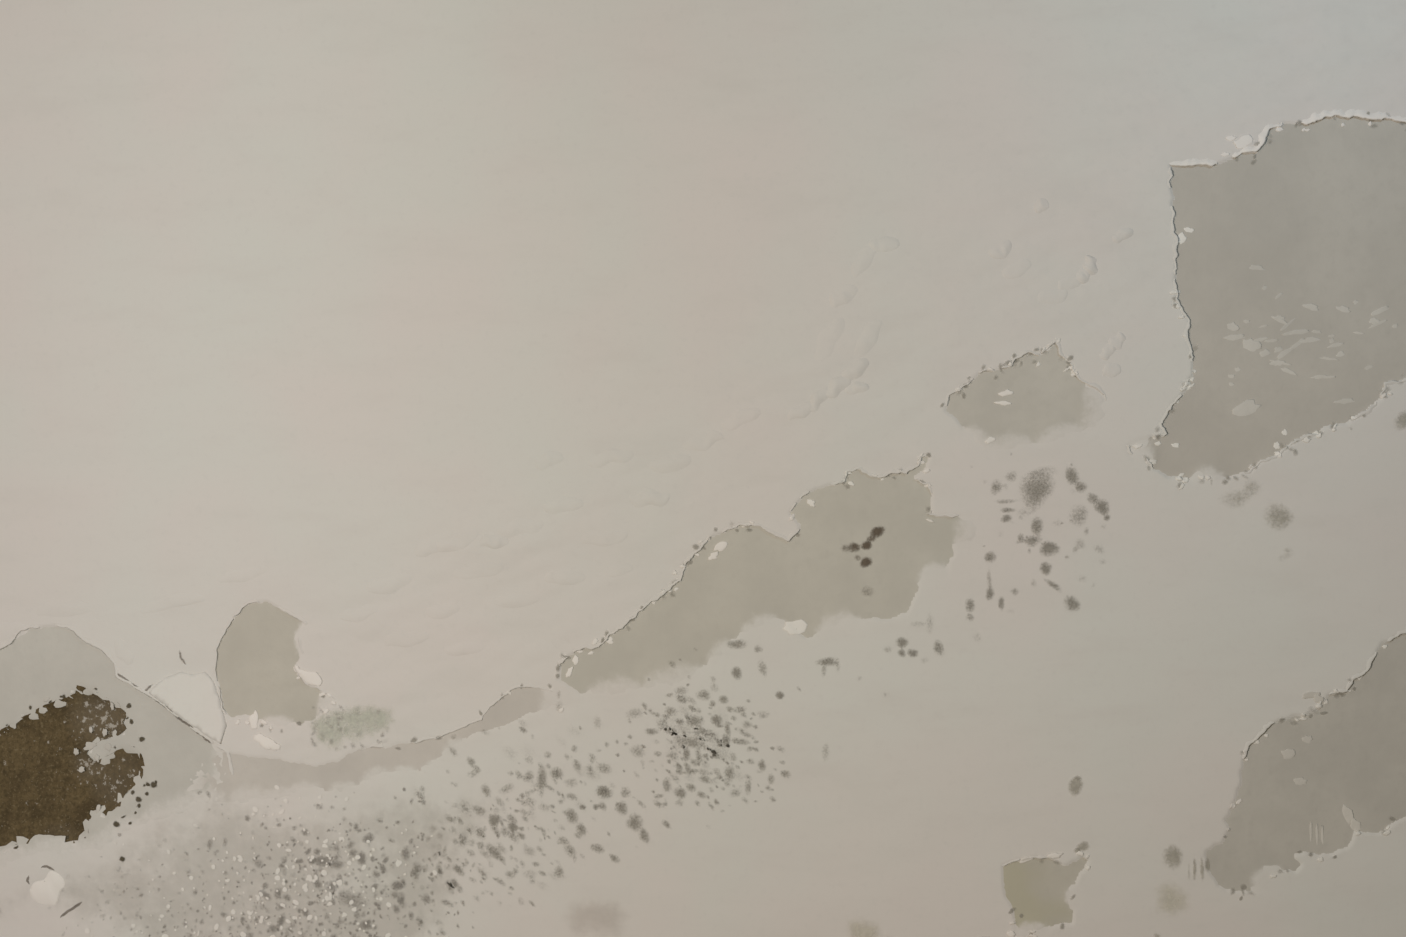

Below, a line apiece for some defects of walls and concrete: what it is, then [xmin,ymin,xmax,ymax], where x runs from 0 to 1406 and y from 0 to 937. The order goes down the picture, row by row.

peeling [1127,109,1406,490]
peeling [941,337,1107,450]
damp [1019,522,1057,586]
damp [1068,470,1109,519]
peeling [0,453,977,867]
peeling [1206,629,1406,900]
damp [131,785,461,937]
peeling [1002,843,1090,937]